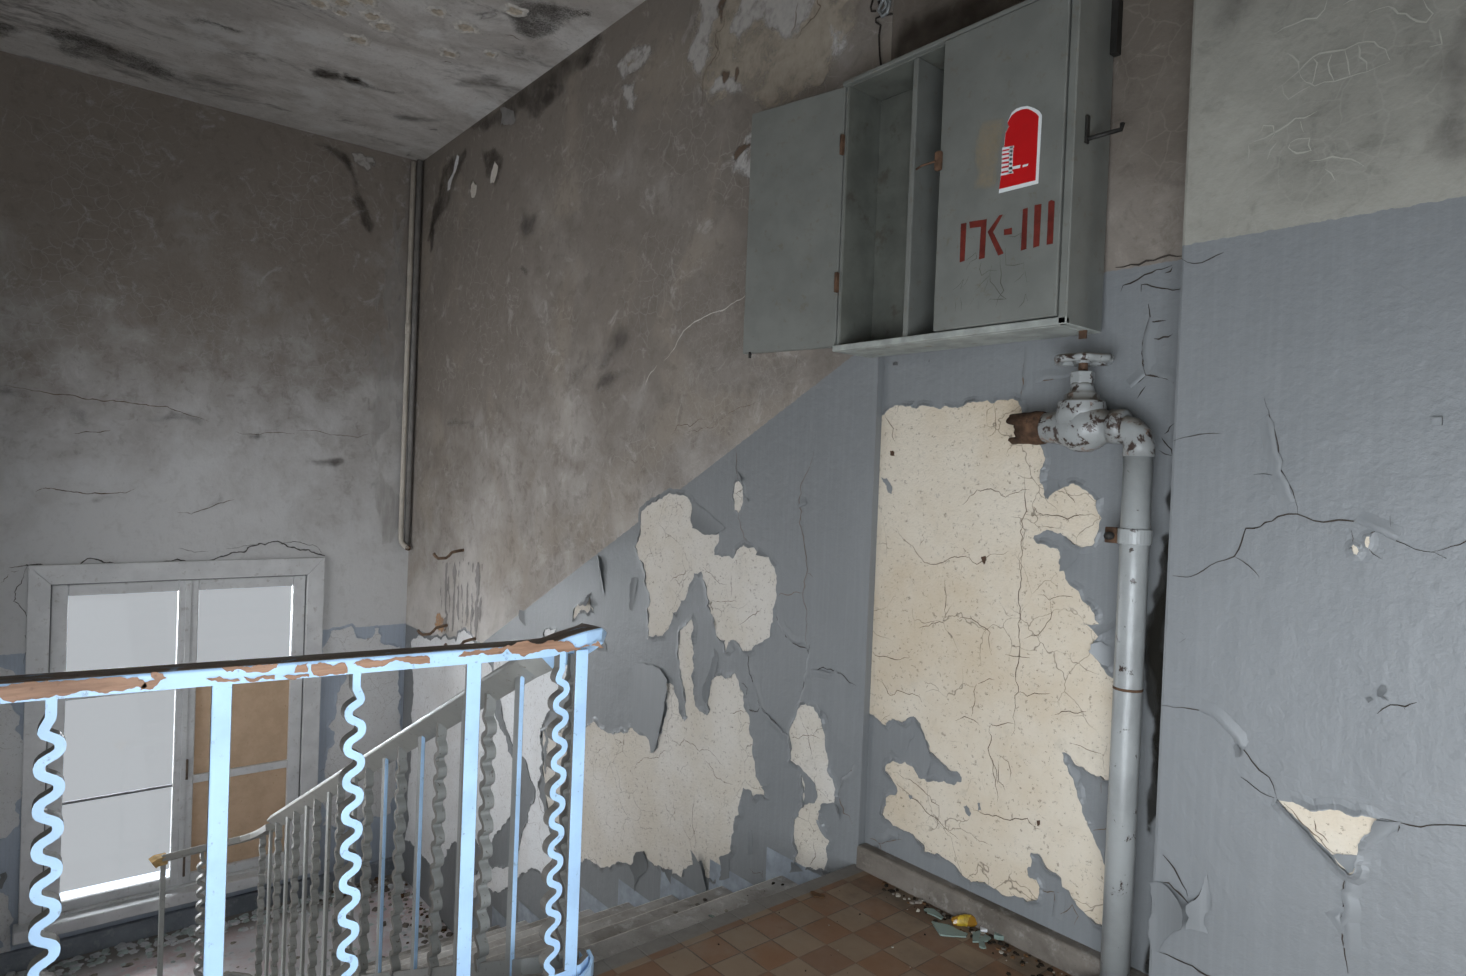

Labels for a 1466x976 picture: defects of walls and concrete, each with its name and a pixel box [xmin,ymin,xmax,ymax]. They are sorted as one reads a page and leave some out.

damp [48,29,176,79]
damp [314,70,368,87]
damp [482,36,599,129]
mould [509,0,589,38]
peeling [580,455,782,894]
peeling [868,393,1116,932]
peeling [0,662,166,843]
peeling [207,556,607,901]
peeling [785,698,841,876]
crack [1161,700,1277,798]
spalling [1268,789,1401,885]
crack [1380,818,1466,831]